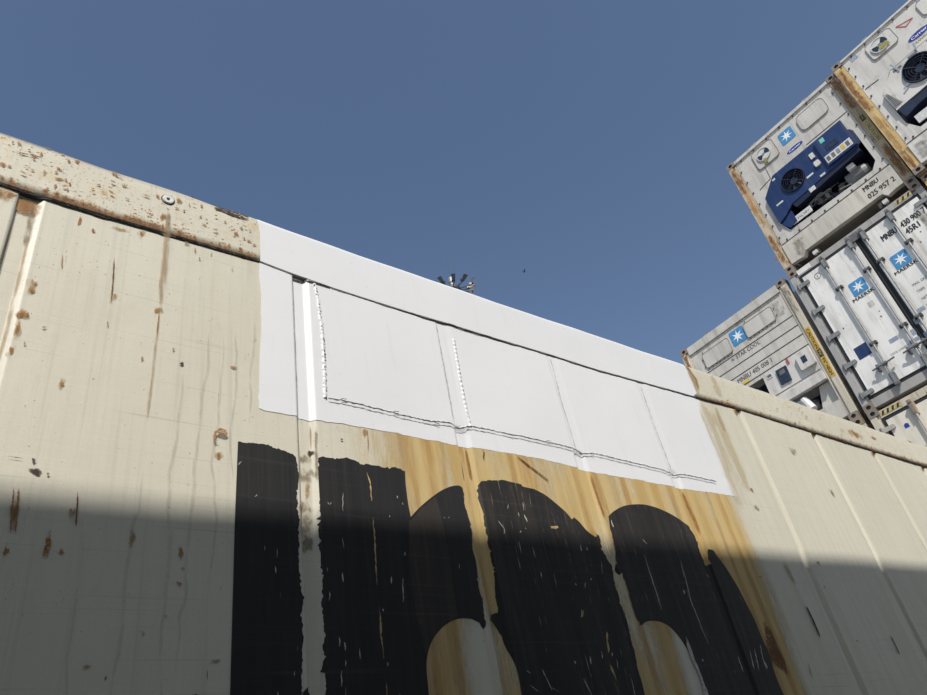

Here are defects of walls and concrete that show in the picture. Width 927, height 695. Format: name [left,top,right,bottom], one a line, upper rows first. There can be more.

rust [0,141,257,259]
rust [683,356,927,470]
rust [10,489,20,532]
rust [42,534,64,556]
rust [398,433,805,695]